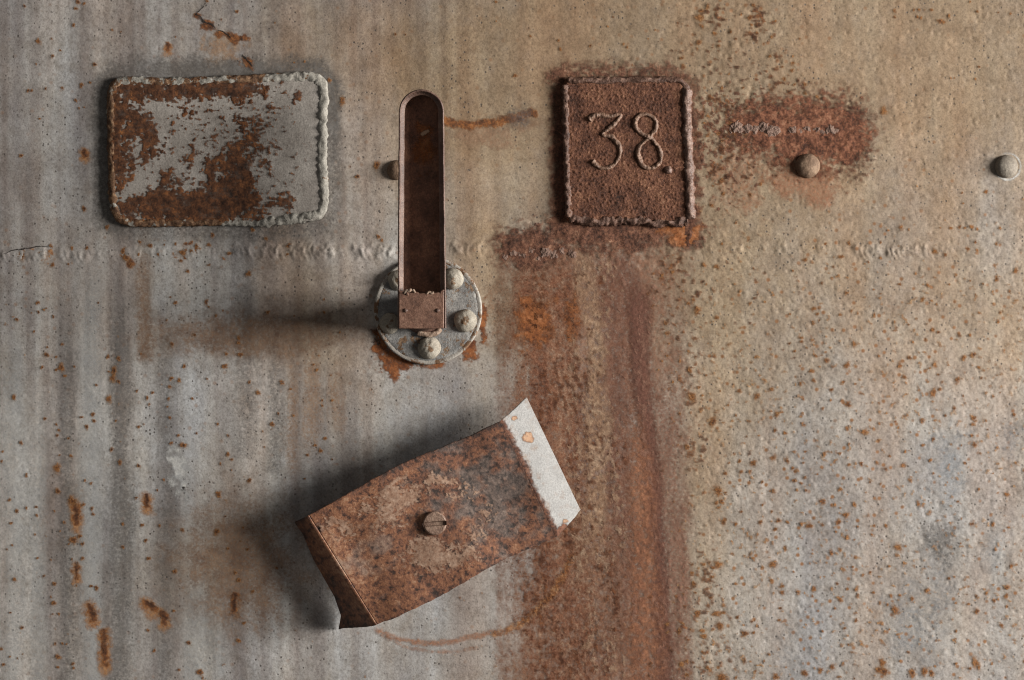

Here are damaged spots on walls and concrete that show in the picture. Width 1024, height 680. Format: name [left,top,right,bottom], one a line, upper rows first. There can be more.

peeling [110,78,306,222]
corrosion [371,328,444,383]
corrosion [444,4,887,680]
corrosion [53,488,111,675]